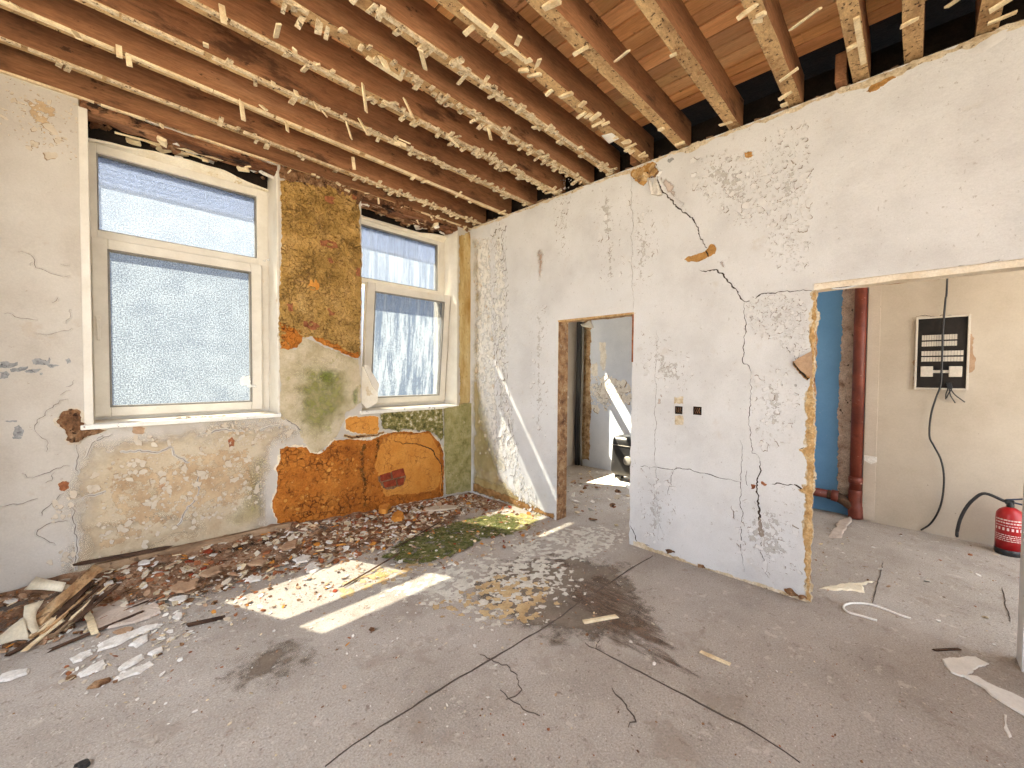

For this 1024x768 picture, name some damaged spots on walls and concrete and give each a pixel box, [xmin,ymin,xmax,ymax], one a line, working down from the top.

peeling [0,76,107,161]
flaking render [126,20,1024,629]
crack [936,258,1000,269]
crack [0,379,201,571]
leakage [73,338,362,572]
flaking render [57,414,445,558]
crack [325,176,858,767]
leakage [475,554,695,675]